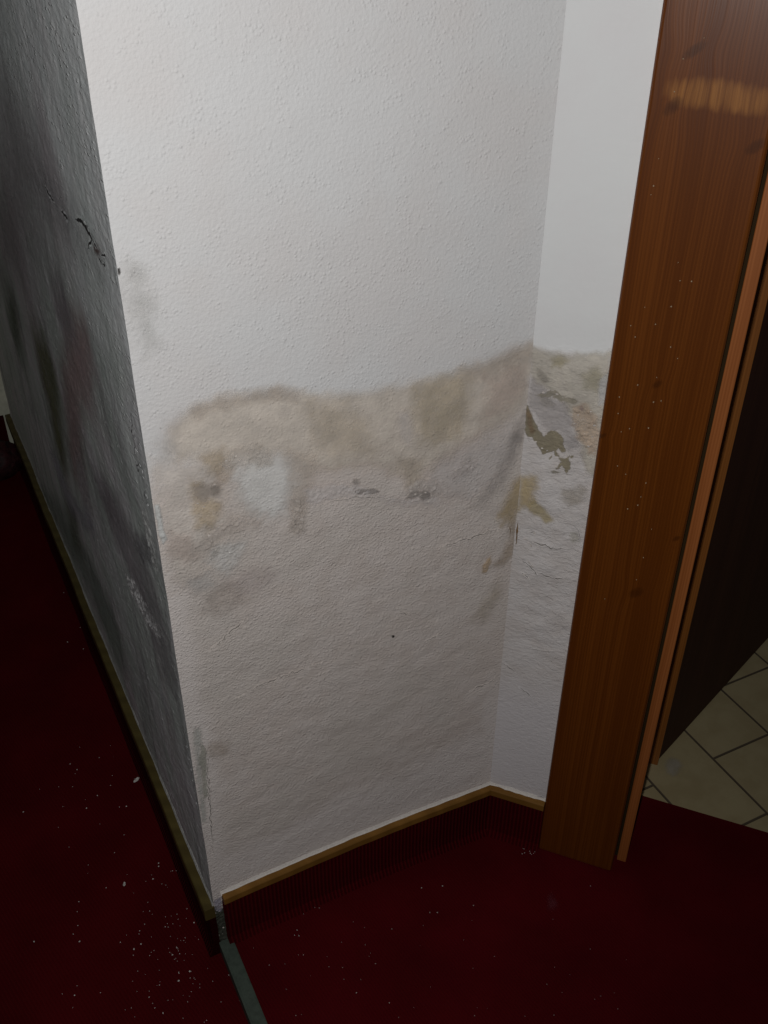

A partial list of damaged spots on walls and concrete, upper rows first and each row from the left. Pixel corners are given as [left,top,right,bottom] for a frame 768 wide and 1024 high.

damp [156,344,612,587]
flaking render [525,406,573,473]